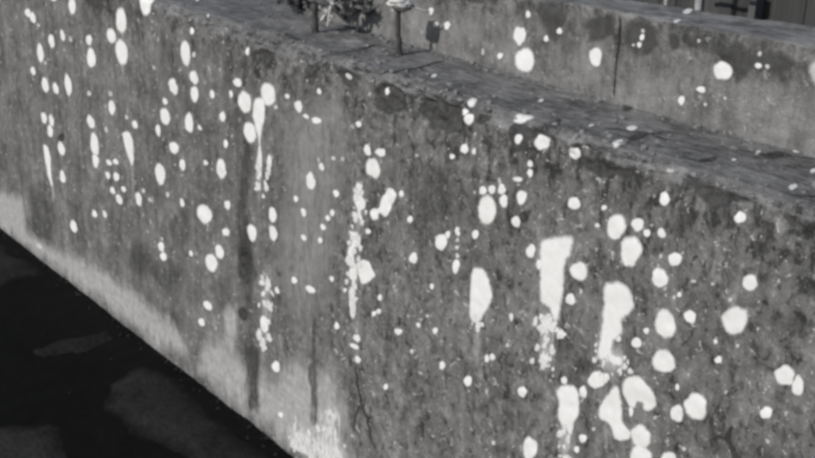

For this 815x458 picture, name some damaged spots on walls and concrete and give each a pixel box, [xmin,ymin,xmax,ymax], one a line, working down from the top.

water stain [198,97,349,458]
crack [353,366,376,449]